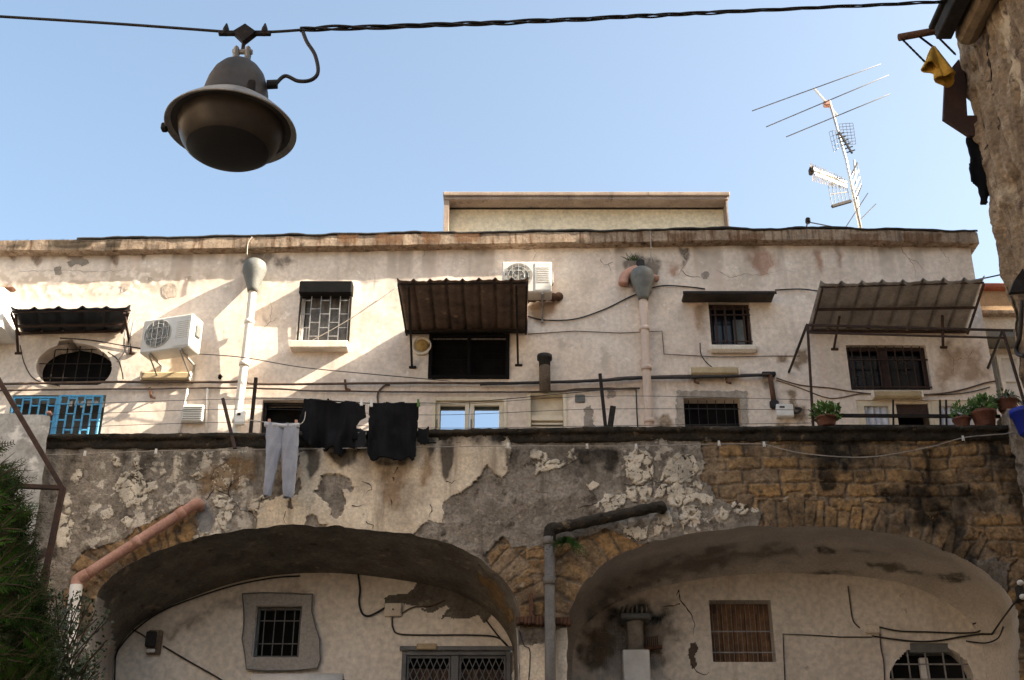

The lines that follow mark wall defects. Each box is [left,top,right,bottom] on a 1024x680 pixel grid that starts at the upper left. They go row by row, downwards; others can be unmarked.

peeling [56,469,82,548]
spalling [60,455,269,641]
peeling [286,473,354,527]
peeling [414,523,432,538]
spalling [486,440,1024,680]
damp [816,440,838,490]
damp [881,449,941,528]
peeling [384,583,491,623]